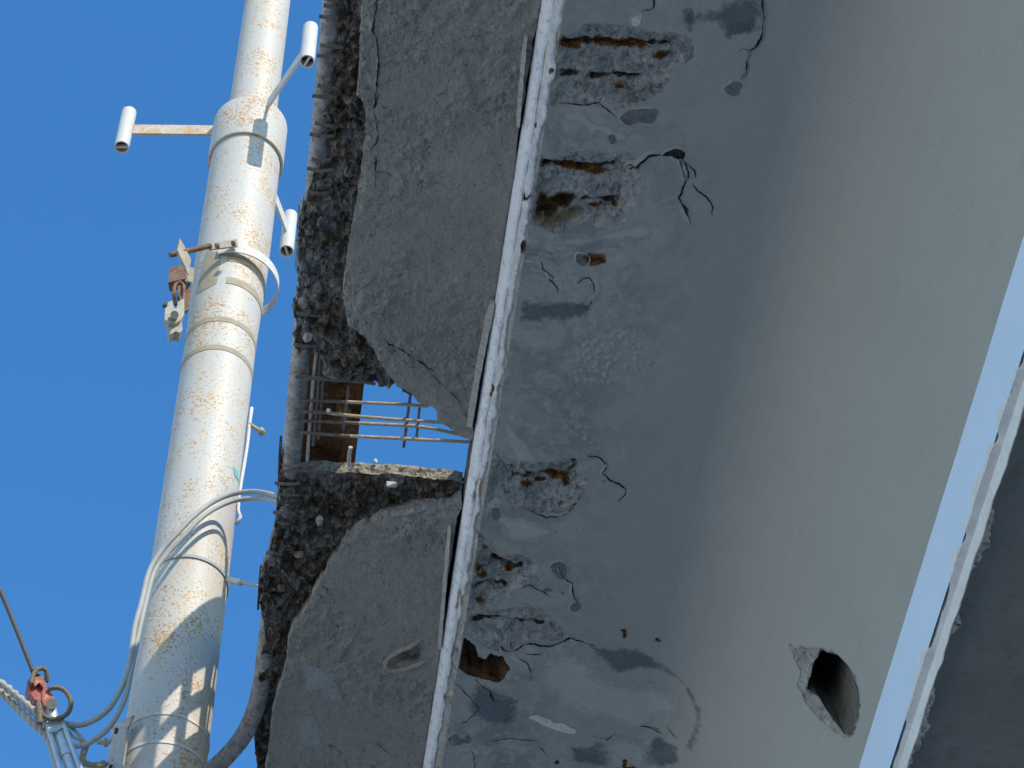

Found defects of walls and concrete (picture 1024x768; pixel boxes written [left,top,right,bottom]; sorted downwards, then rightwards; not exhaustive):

damp [709,0,758,35]
crack [738,0,767,77]
spalling [529,12,694,233]
crack [623,150,713,225]
crack [540,263,595,309]
rust [583,253,606,266]
spalling [254,0,470,768]
spalling [484,451,588,521]
crack [587,456,626,503]
spalling [459,530,571,683]
crack [500,638,595,680]